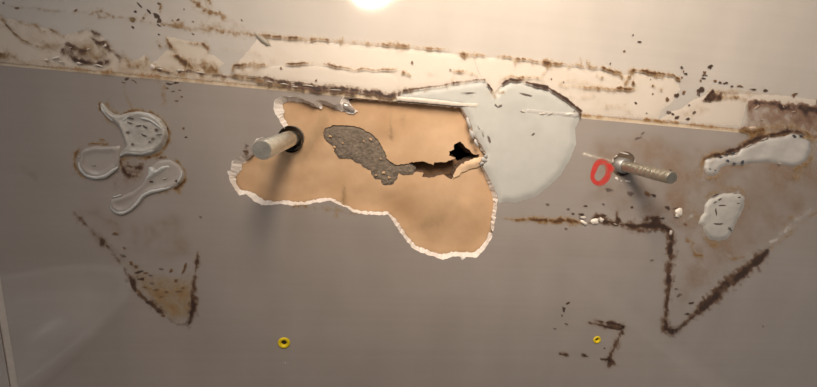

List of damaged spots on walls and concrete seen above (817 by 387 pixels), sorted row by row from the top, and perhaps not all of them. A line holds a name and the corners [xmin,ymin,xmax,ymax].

peeling [166,36,224,73]
damp [250,33,355,43]
damp [498,55,687,95]
damp [644,91,727,129]
damp [697,65,817,139]
spalling [227,81,498,260]
damp [504,155,778,335]